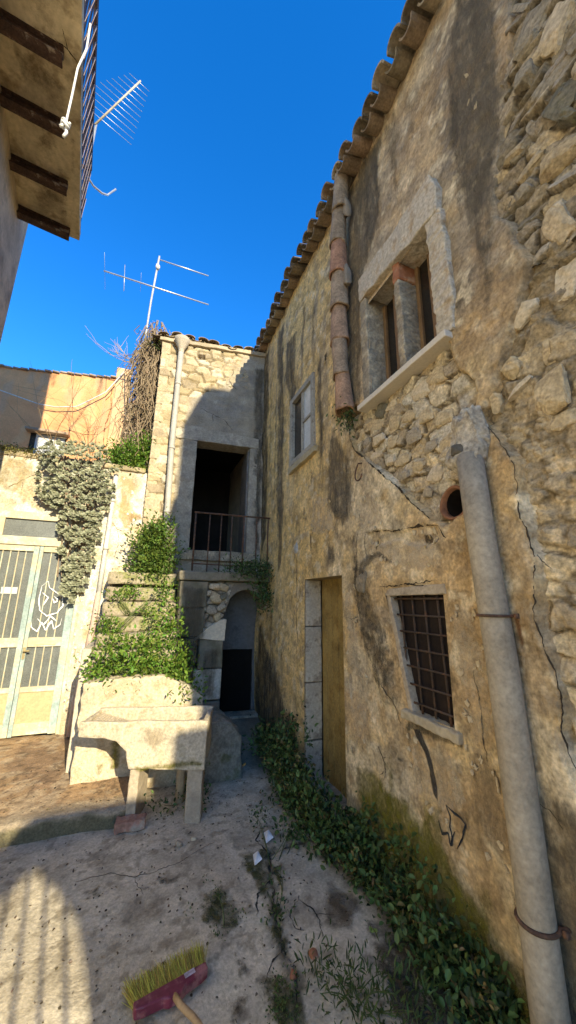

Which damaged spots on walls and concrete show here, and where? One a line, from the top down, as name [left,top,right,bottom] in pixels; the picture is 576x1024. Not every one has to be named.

damp [449,0,501,258]
spalling [353,0,576,754]
crack [346,429,446,628]
crack [488,427,576,768]
crack [76,842,214,891]